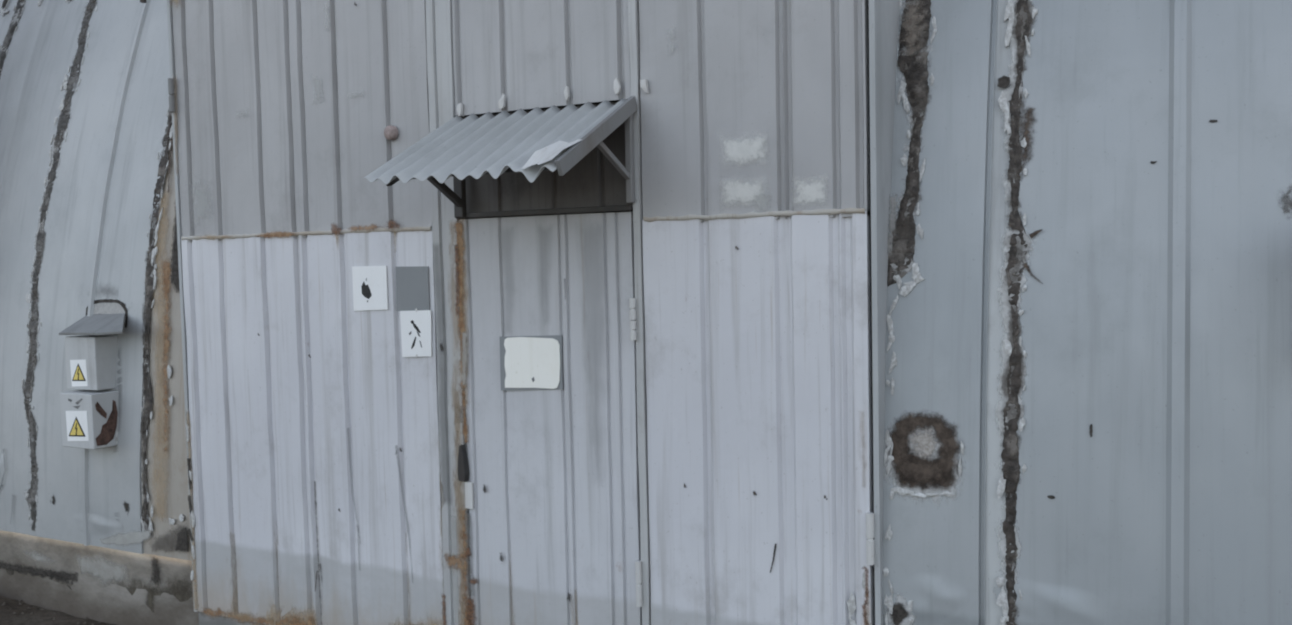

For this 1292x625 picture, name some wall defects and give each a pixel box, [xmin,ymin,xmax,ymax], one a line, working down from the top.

crack [86,299,128,328]
corrosion [162,261,171,451]
corrosion [454,222,468,442]
peeling [886,263,925,395]
peeling [884,430,955,500]
corrosion [152,526,184,552]
corrosion [203,608,315,625]
corrosion [445,508,478,625]
peeling [847,567,914,625]